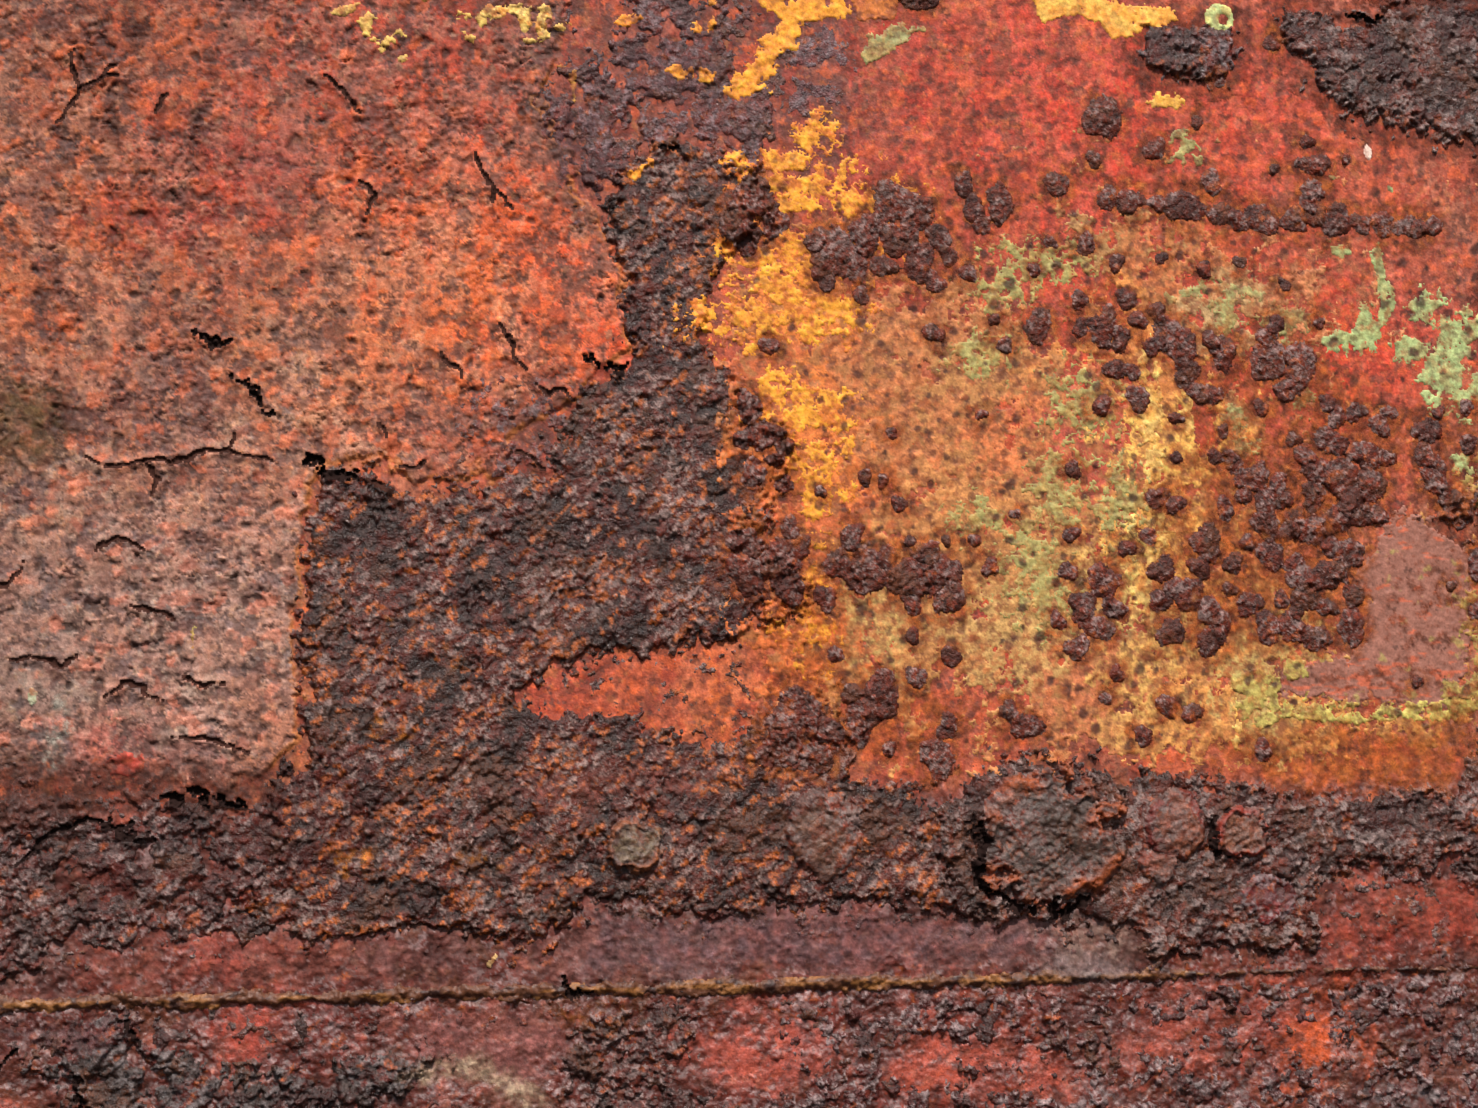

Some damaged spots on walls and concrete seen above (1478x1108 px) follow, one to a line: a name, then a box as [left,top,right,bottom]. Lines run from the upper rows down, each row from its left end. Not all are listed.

crack [55,47,119,124]
peeling [664,0,926,101]
corrosion [1121,0,1478,168]
peeling [627,158,654,181]
corrosion [800,172,977,310]
corrosion [946,93,1444,252]
crack [84,328,427,512]
peeling [663,106,1478,779]
corrosion [981,226,1478,710]
crack [94,535,146,552]
crack [9,653,78,669]
corrosion [2,989,740,1108]